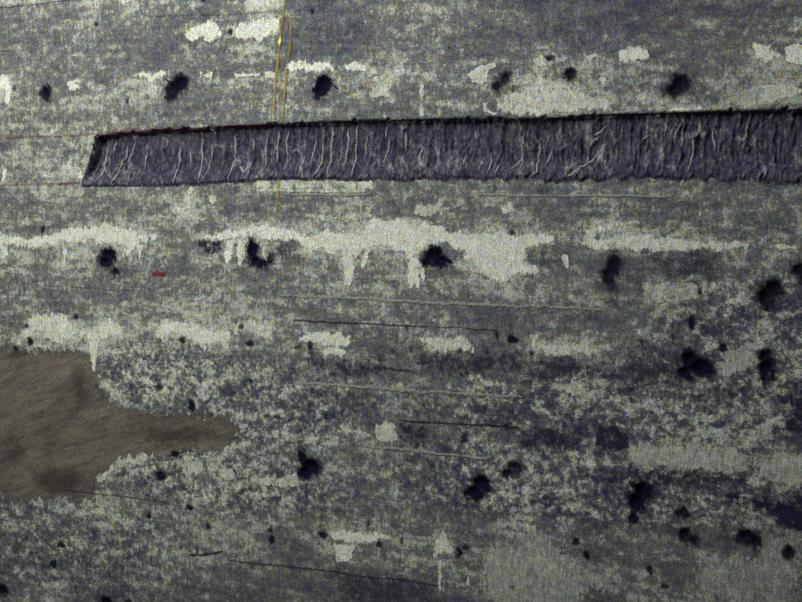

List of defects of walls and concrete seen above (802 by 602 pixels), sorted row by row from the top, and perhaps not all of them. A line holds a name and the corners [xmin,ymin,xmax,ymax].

rust [273,0,292,120]
peeling [256,180,373,193]
leakage [198,238,222,254]
crack [294,320,498,331]
crack [401,420,521,428]